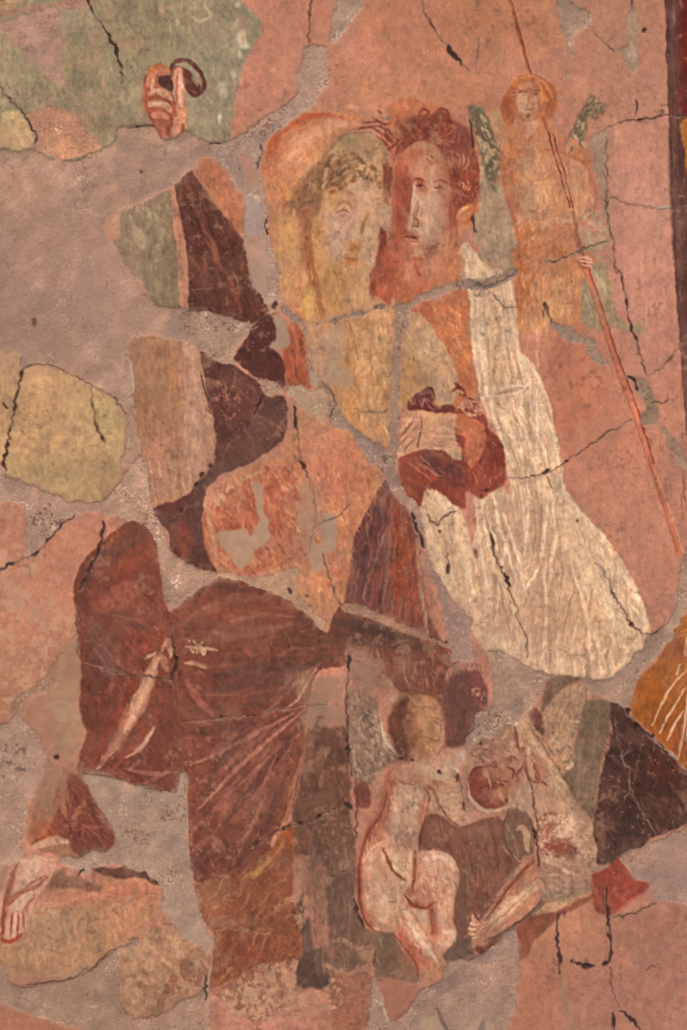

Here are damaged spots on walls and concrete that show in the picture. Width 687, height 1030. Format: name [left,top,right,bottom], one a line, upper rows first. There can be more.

crack [86,0,124,76]
crack [422,1,480,66]
crack [2,364,127,472]
flaking render [0,0,557,748]
crack [490,534,516,605]
flaking render [583,551,687,707]
flaking render [0,642,84,871]
crack [75,616,359,851]
flaking render [60,772,214,952]
flaking render [620,826,687,905]
flaking render [365,929,520,1030]
crack [555,888,657,1030]